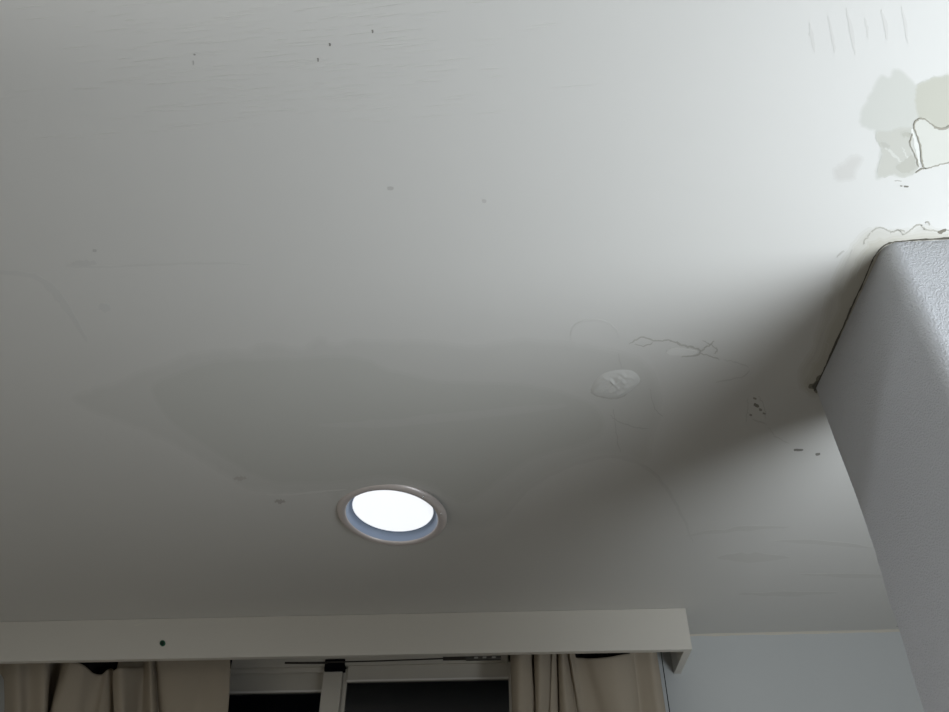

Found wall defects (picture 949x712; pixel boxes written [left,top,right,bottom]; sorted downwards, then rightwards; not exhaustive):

peeling [911,119,949,168]
crack [629,336,720,360]
leakage [72,336,663,532]